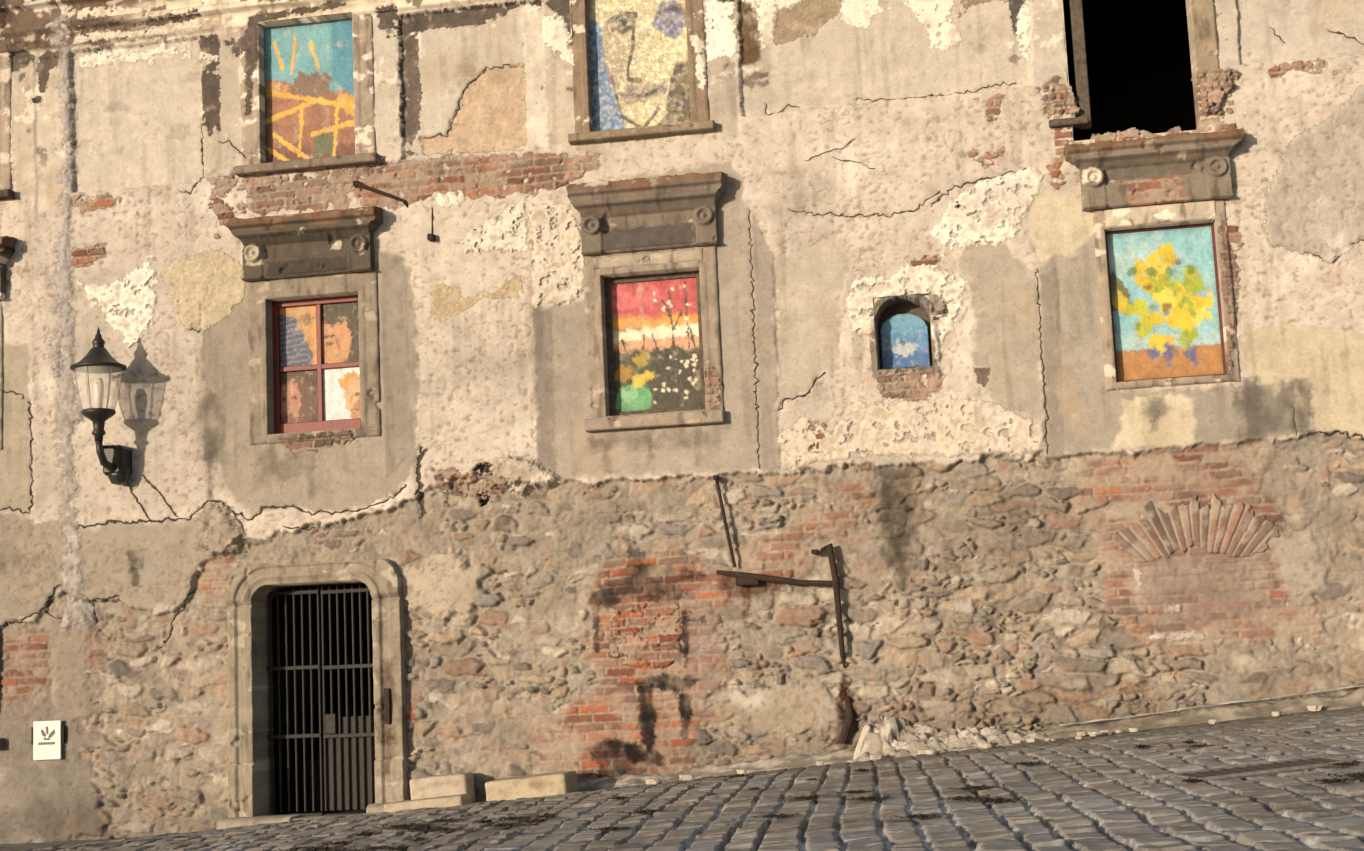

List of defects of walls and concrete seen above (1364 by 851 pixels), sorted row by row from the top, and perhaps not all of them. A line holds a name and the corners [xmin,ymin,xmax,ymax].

peeling [0,0,346,136]
peeling [690,0,1032,90]
flaking render [1267,58,1325,78]
flaking render [71,0,600,349]
spalling [1260,85,1364,263]
peeling [846,147,1067,402]
flaking render [1217,220,1244,374]
crack [76,446,427,548]
crack [0,584,119,628]
crack [158,591,195,649]
leakage [624,684,663,766]
leakage [678,693,693,729]